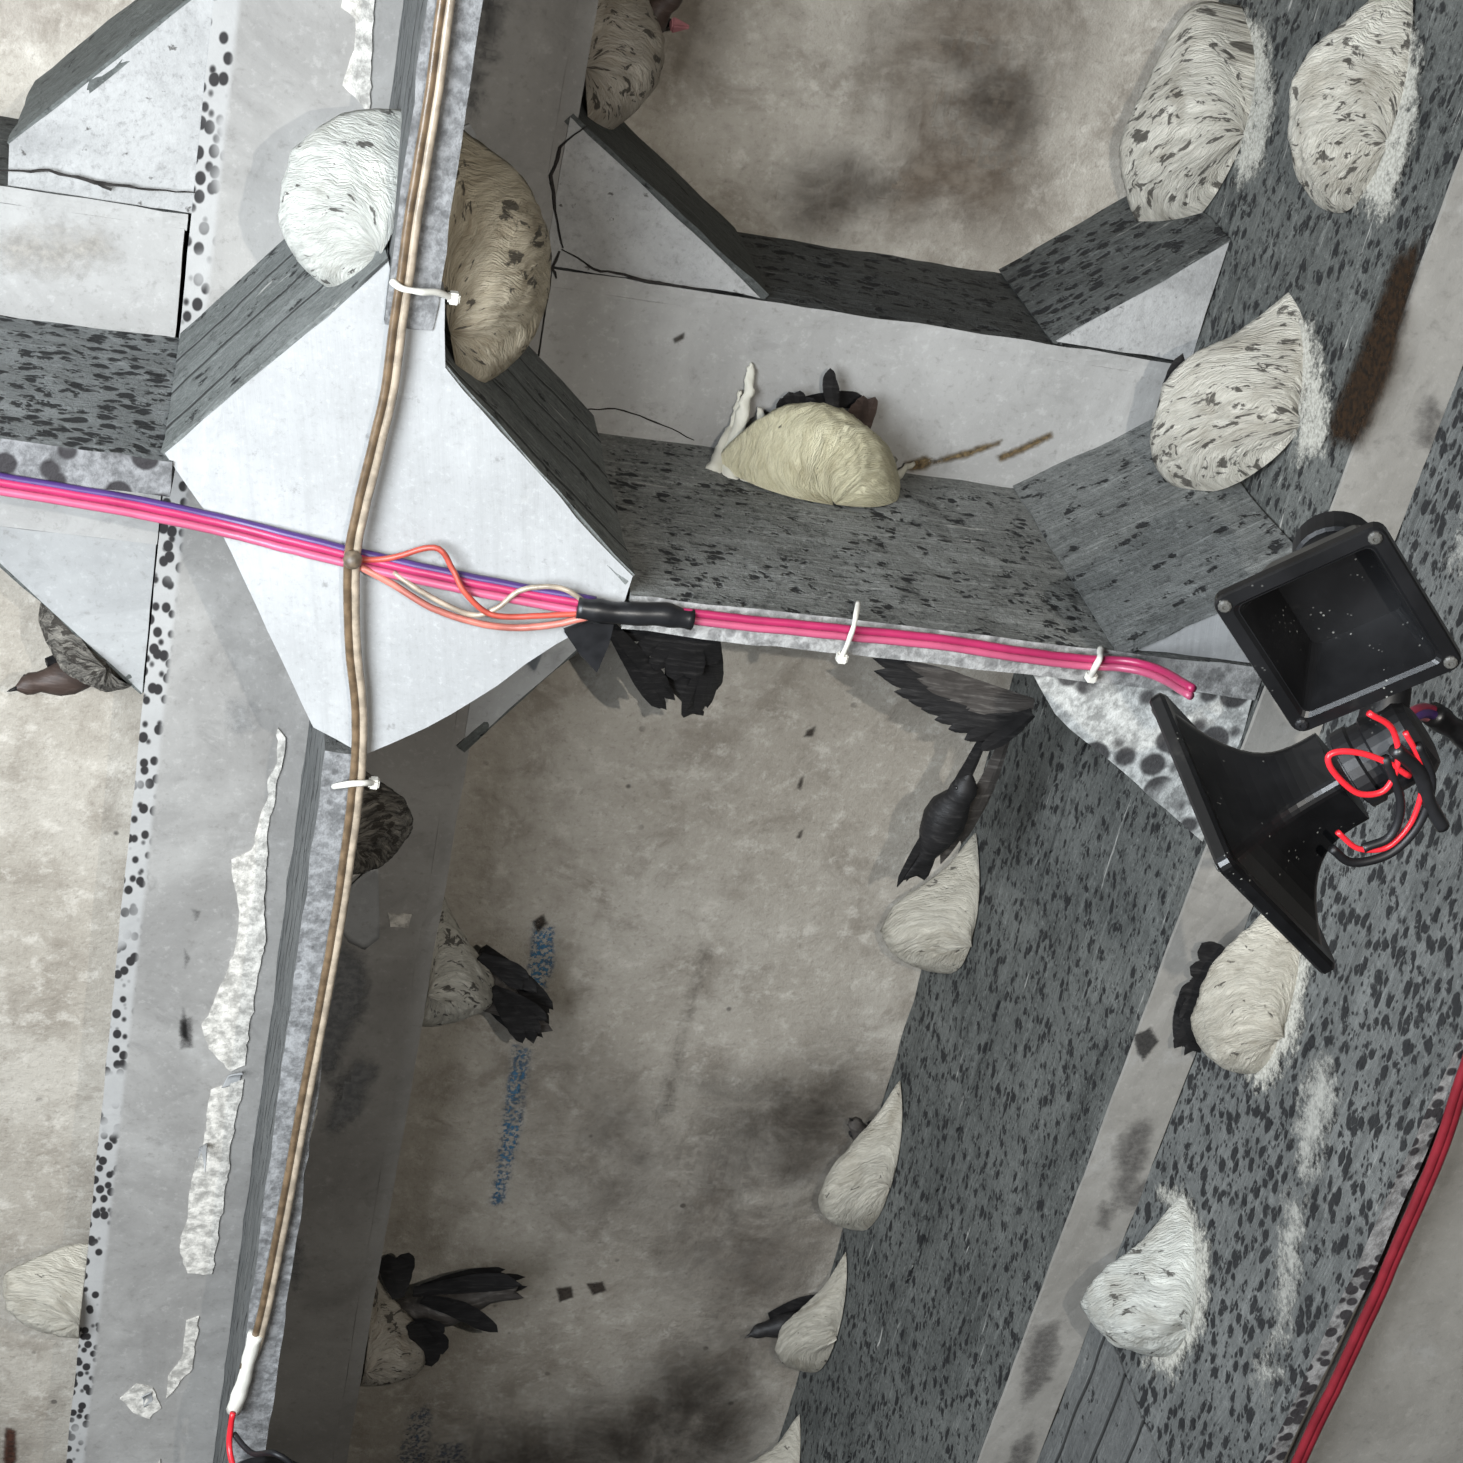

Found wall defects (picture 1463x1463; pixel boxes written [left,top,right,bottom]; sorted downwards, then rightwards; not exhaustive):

damp [830,0,1035,217]
peeling [180,728,285,1275]
peeling [343,869,412,950]
damp [557,1282,605,1302]